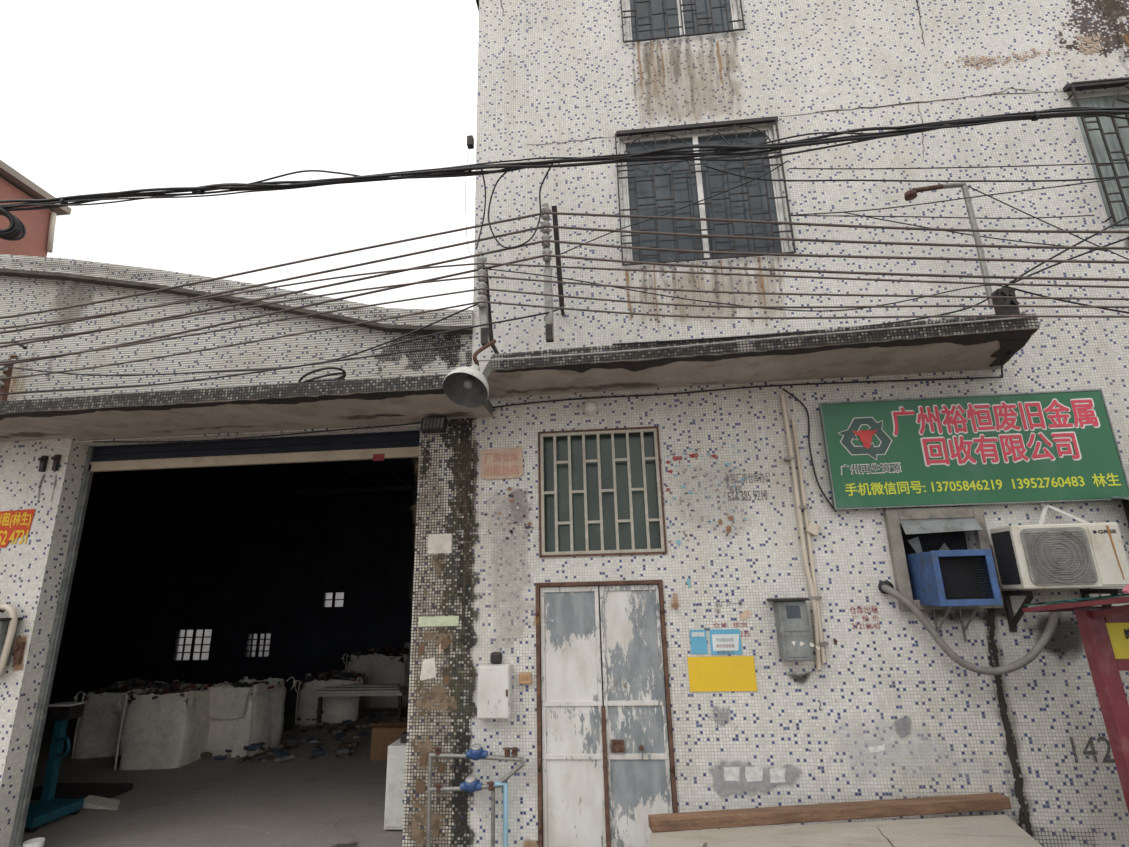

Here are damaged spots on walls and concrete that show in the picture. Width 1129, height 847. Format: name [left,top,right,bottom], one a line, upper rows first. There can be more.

leakage [1052,0,1129,60]
leakage [420,412,480,847]
leakage [922,606,1033,838]